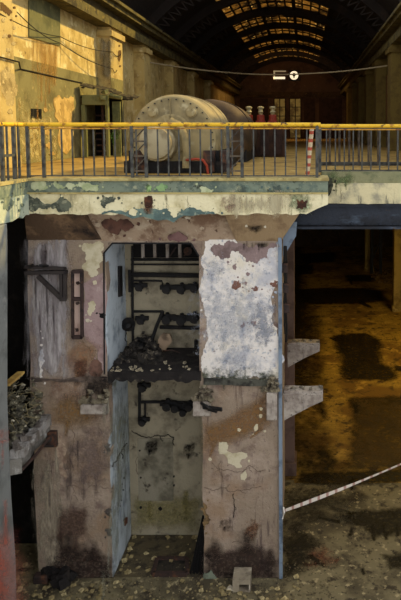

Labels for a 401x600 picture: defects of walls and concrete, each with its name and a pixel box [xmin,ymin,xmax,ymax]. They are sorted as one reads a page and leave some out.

flaking render [43,95,74,155]
peeling [1,181,223,237]
peeling [79,241,108,370]
peeling [199,240,285,393]
crack [112,431,174,474]
peeling [218,442,250,480]
leakage [38,447,113,578]
crack [204,462,263,518]
leakage [201,532,276,578]